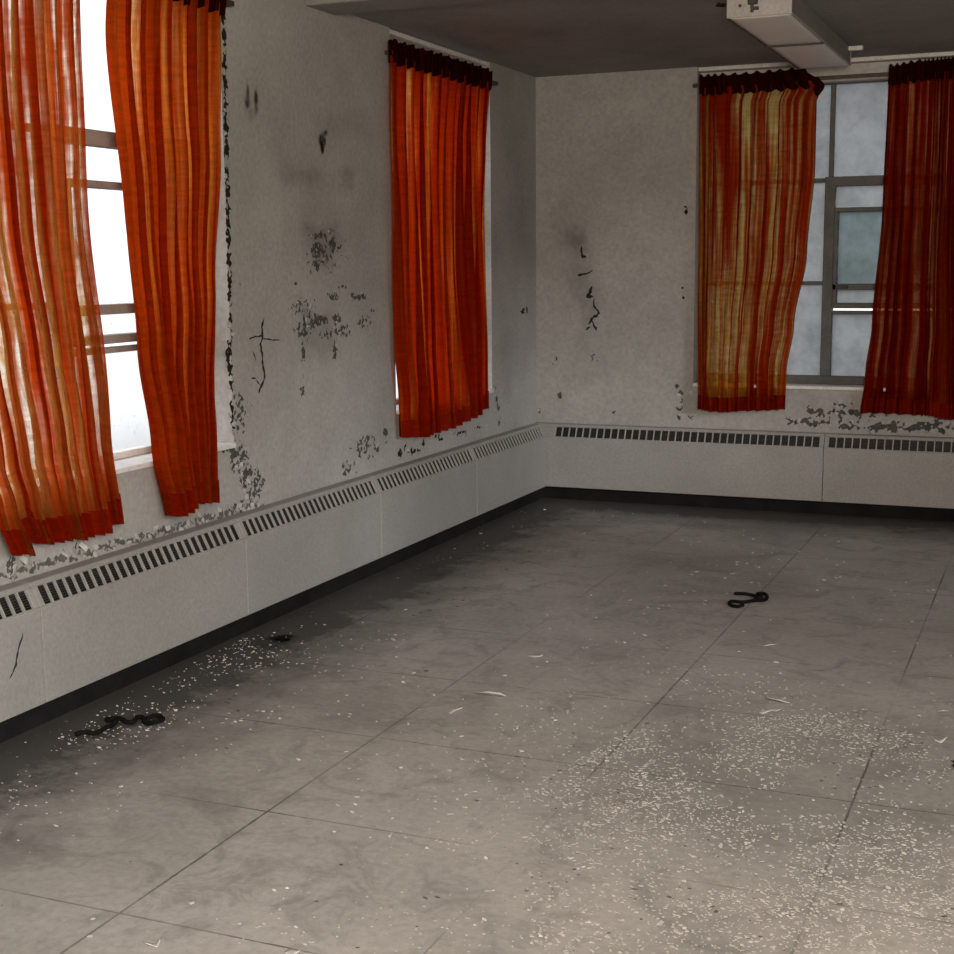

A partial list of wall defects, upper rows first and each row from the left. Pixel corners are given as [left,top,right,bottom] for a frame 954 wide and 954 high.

spalling [0,16,265,582]
crack [249,319,279,393]
spalling [306,224,346,275]
spalling [288,282,374,396]
crack [578,246,600,330]
peeling [786,400,954,435]